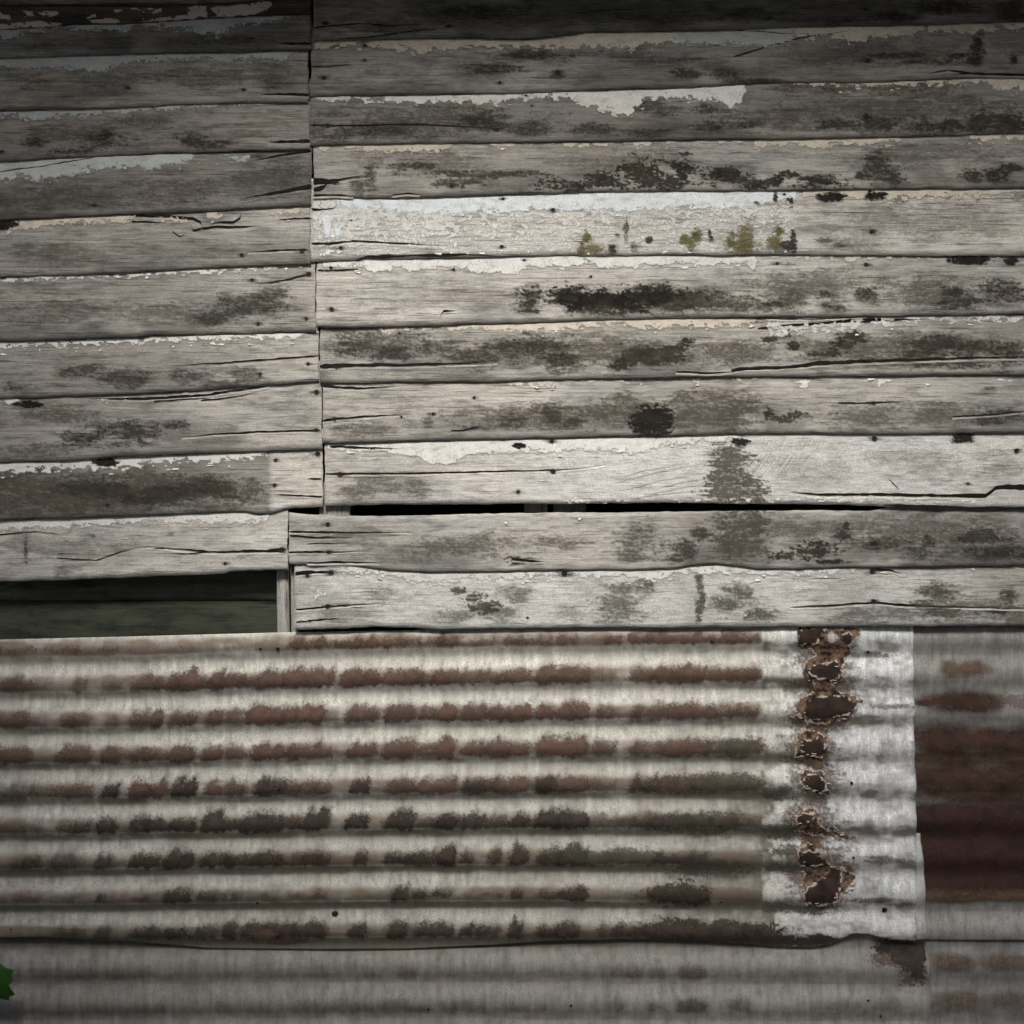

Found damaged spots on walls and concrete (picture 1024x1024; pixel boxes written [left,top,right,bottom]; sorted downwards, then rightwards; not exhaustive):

peeling [312,84,747,118]
crack [127,123,497,283]
peeling [264,189,1024,274]
leakage [392,151,906,208]
leakage [516,274,845,317]
peeling [327,435,738,465]
leakage [454,389,1024,565]
crack [791,479,1024,510]
crack [0,531,412,578]
corrosion [131,663,590,692]
corrosion [784,627,863,913]
corrosion [914,690,1024,903]